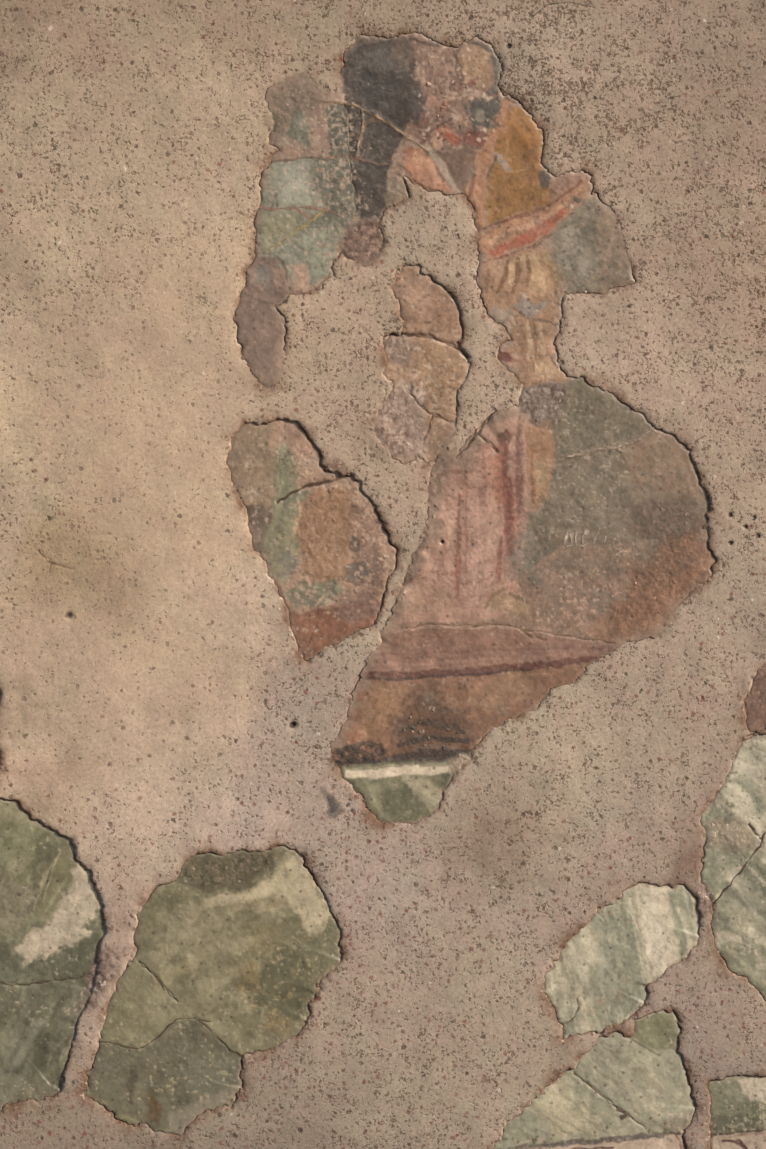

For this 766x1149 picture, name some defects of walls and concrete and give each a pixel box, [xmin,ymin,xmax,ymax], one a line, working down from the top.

crack [259,98,430,249]
crack [362,328,469,358]
crack [406,390,448,430]
crack [456,410,497,459]
crack [558,428,653,461]
crack [276,475,352,504]
crack [406,623,613,643]
crack [711,823,766,906]
crack [98,962,241,1058]
crack [573,1073,645,1127]